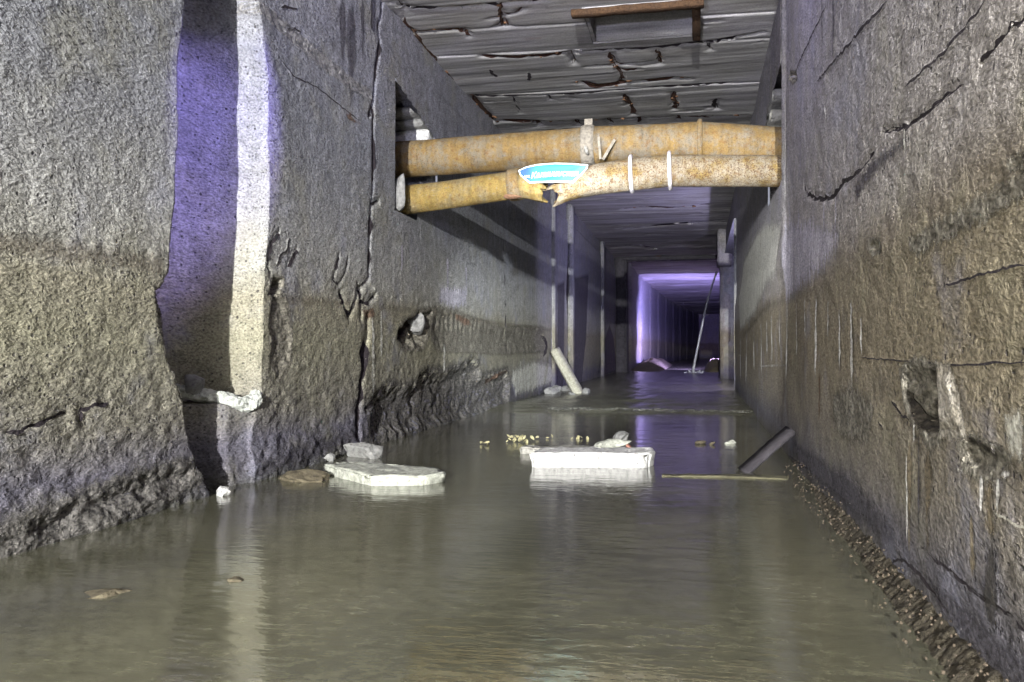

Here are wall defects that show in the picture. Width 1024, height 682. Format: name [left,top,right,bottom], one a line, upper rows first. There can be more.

crack [796,0,1024,205]
spalling [268,275,284,297]
crack [281,0,751,440]
crack [945,261,1024,288]
crack [6,400,108,438]
spalling [365,305,545,444]
crack [861,356,1024,368]
spalling [899,357,1011,483]